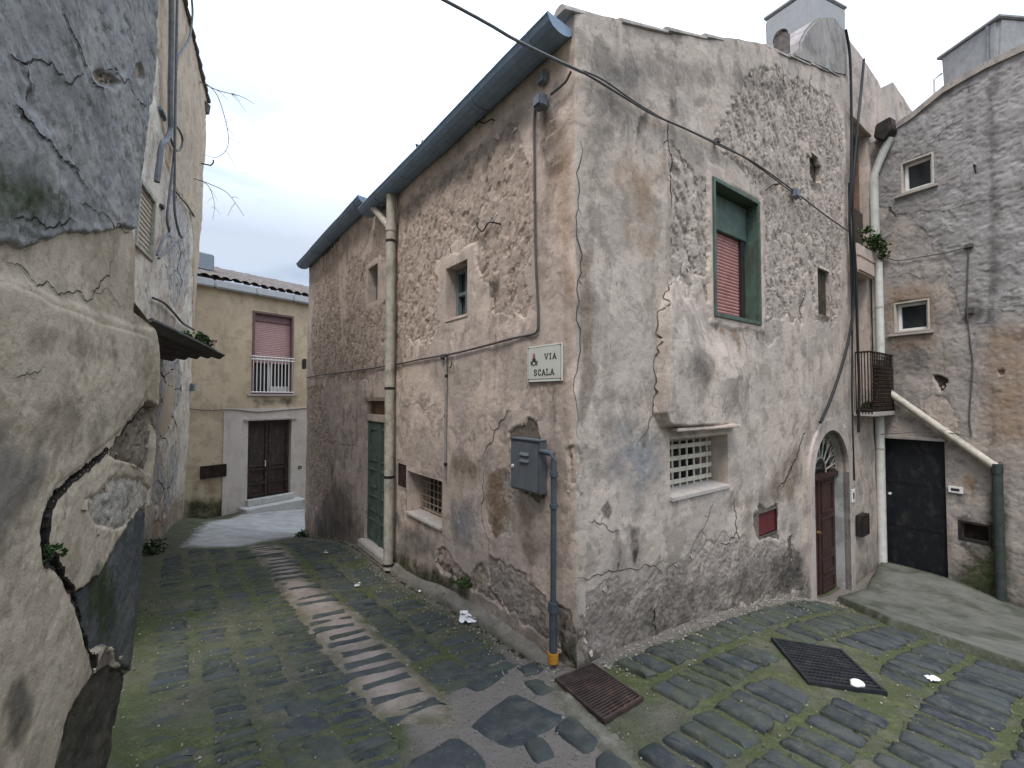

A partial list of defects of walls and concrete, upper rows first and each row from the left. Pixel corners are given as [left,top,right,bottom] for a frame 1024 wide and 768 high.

crack [5,5,148,306]
crack [664,120,677,208]
flaking render [308,122,534,511]
crack [551,141,583,433]
crack [40,360,180,673]
flaking render [82,358,182,537]
crack [479,407,510,550]
flaking render [487,468,545,538]
flaking render [510,417,541,439]
flaking render [435,502,808,664]
crack [577,499,740,585]
flaking render [920,375,960,435]